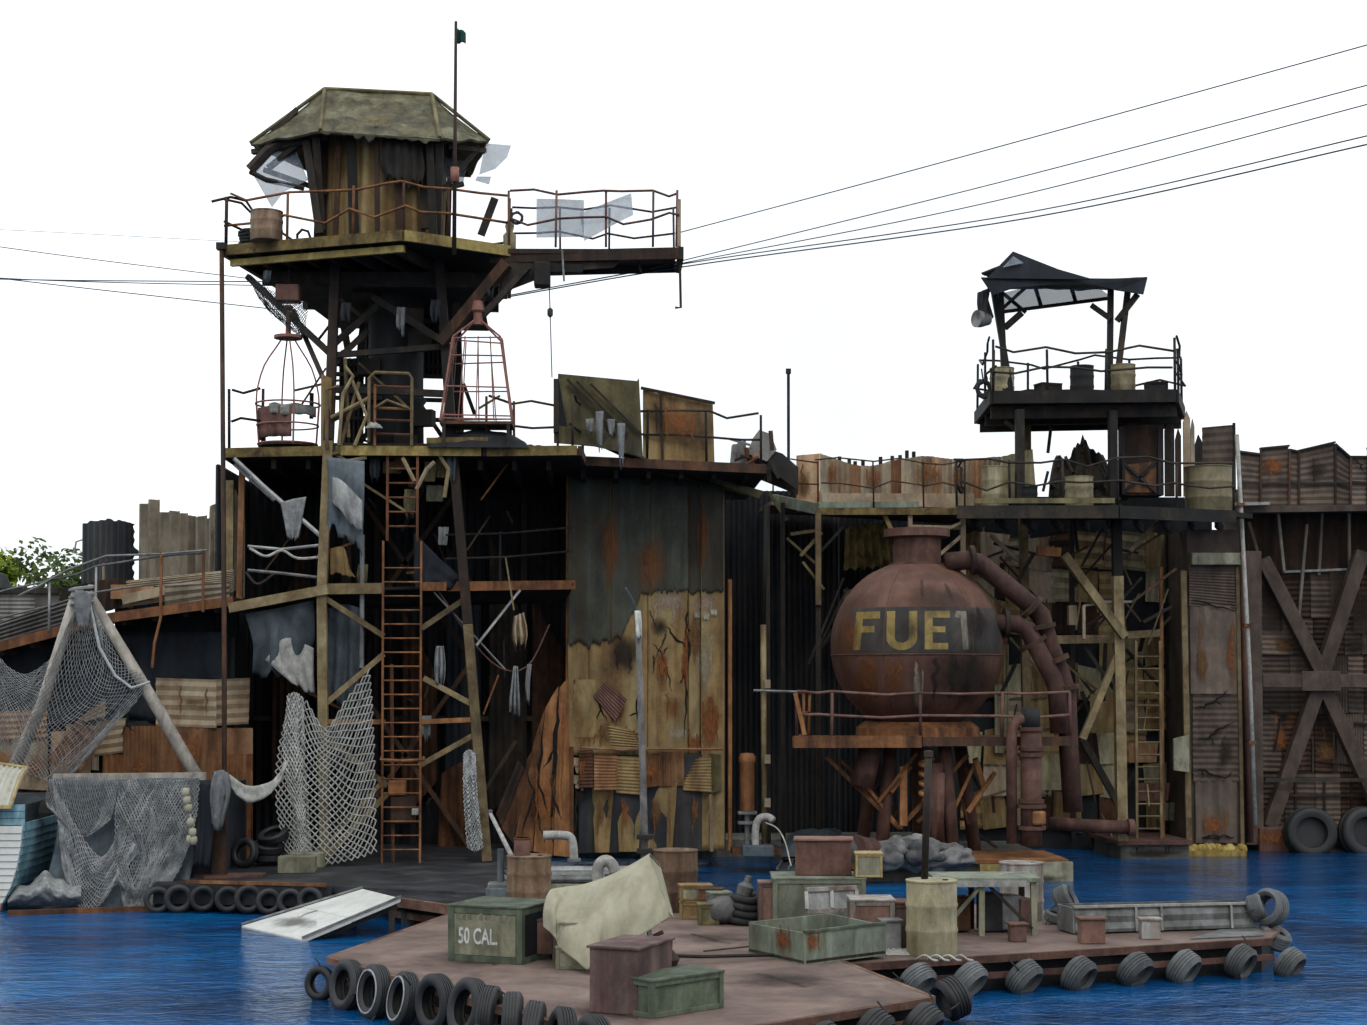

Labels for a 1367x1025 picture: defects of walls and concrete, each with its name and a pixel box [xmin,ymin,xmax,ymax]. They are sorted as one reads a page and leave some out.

corrosion [657,633,688,718]
corrosion [688,697,718,754]